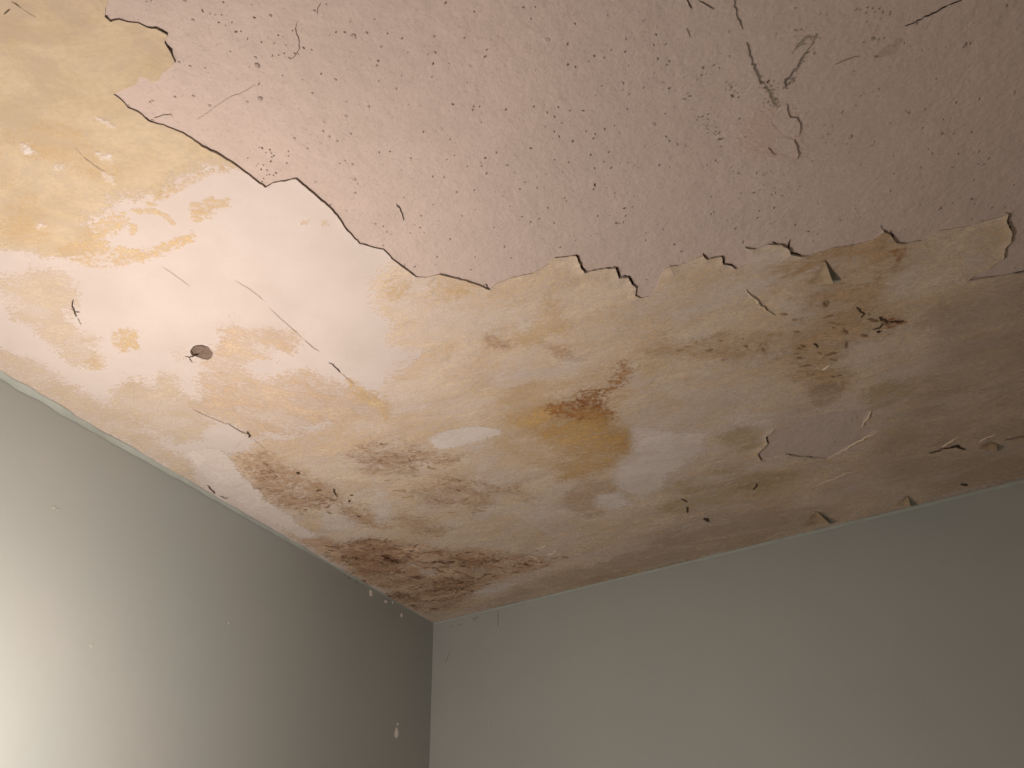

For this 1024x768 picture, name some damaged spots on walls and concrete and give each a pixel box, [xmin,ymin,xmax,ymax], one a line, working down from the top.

crack [686,0,816,107]
crack [835,0,962,65]
peeling [105,0,1024,297]
spalling [185,345,213,363]
crack [237,282,353,384]
crack [856,307,903,333]
crack [193,409,265,450]
water stain [0,215,1024,623]